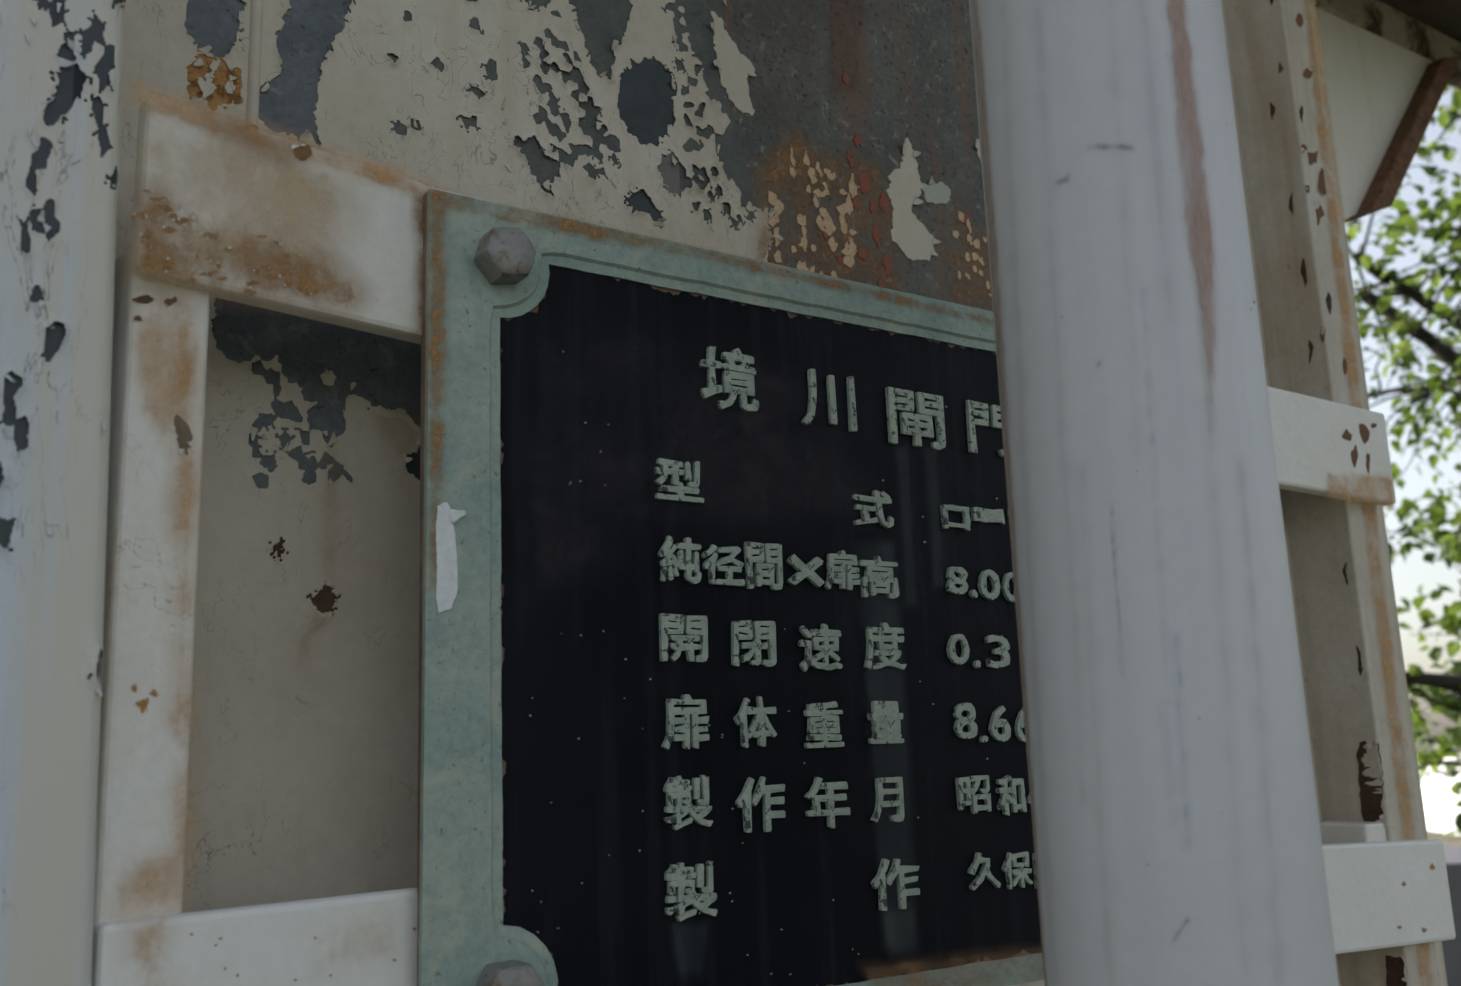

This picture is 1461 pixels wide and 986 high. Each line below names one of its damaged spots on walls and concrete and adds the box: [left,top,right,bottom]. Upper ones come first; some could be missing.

peeling [19,0,123,253]
peeling [184,0,356,146]
corrosion [291,144,312,161]
corrosion [544,216,658,243]
peeling [504,0,993,312]
corrosion [760,134,912,305]
corrosion [1169,0,1213,336]
peeling [0,368,29,452]
peeling [40,321,66,362]
corrosion [131,293,178,321]
peeling [131,189,421,489]
corrosion [131,683,160,713]